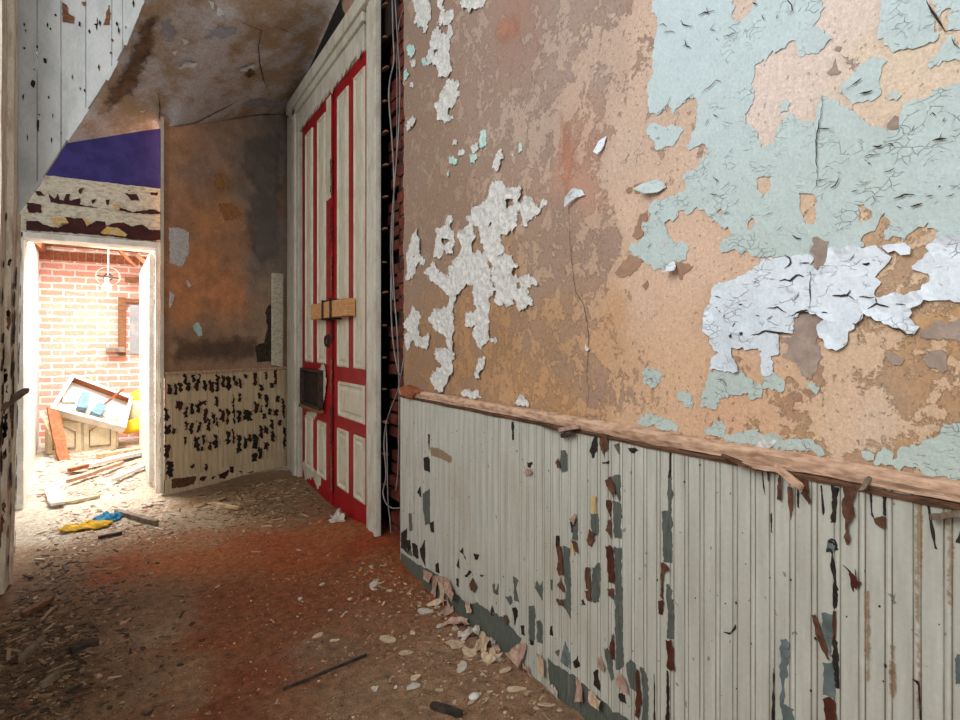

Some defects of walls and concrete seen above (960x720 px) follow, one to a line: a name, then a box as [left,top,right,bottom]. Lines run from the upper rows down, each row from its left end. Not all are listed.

crack [158,20,290,127]
peeling [412,0,486,124]
crack [660,7,735,47]
crack [926,1,960,49]
peeling [26,187,189,267]
peeling [381,43,548,613]
peeling [614,0,960,380]
crack [716,213,910,335]
crack [811,94,953,208]
peeling [160,305,287,488]
peeling [490,450,675,720]
peeling [762,472,886,720]